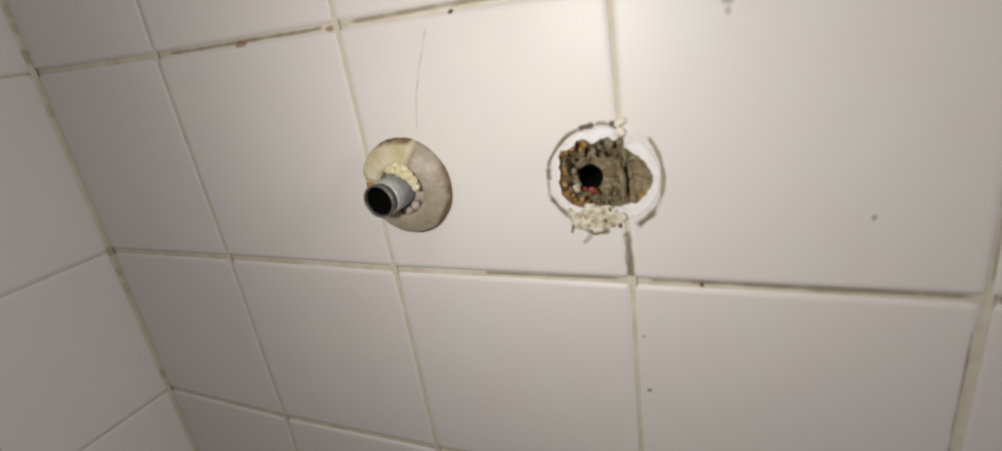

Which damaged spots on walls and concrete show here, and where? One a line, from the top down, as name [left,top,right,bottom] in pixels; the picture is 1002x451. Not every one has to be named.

spalling [559,137,653,235]